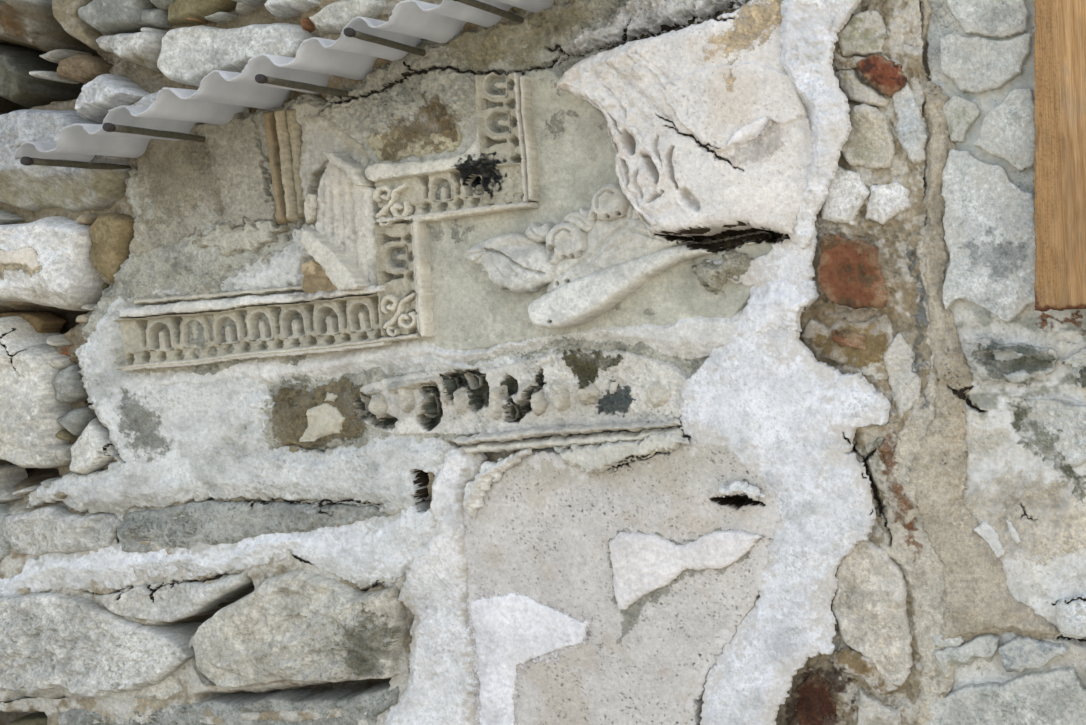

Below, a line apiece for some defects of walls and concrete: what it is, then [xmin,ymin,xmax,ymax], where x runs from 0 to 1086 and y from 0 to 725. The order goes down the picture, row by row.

crack [321,0,737,111]
crack [656,114,744,171]
spalling [717,116,785,165]
damp [469,159,507,198]
crack [0,328,24,373]
crack [843,432,892,545]
crack [92,572,228,603]
peeling [608,527,763,643]
peeling [466,590,594,725]
crack [1057,635,1086,643]